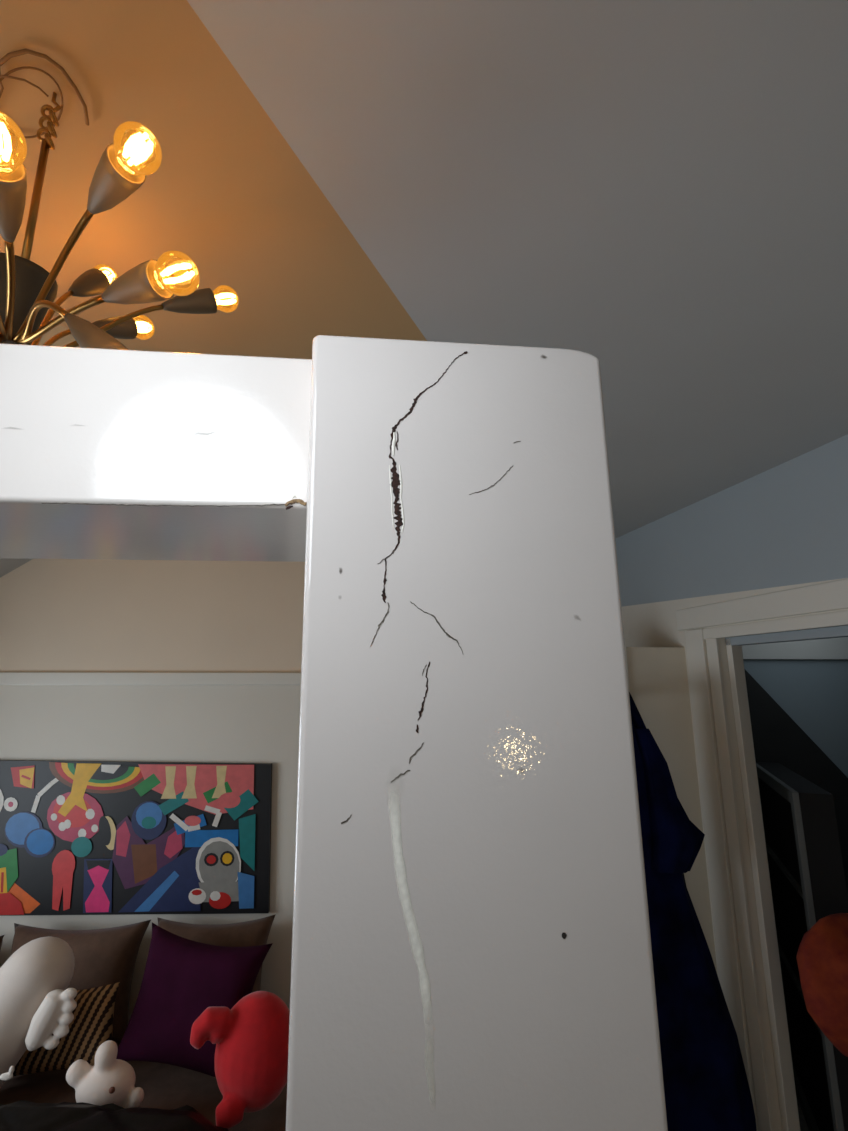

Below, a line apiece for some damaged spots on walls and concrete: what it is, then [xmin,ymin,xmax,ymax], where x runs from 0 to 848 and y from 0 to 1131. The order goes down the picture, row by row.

crack [370,353,464,653]
crack [391,662,430,782]